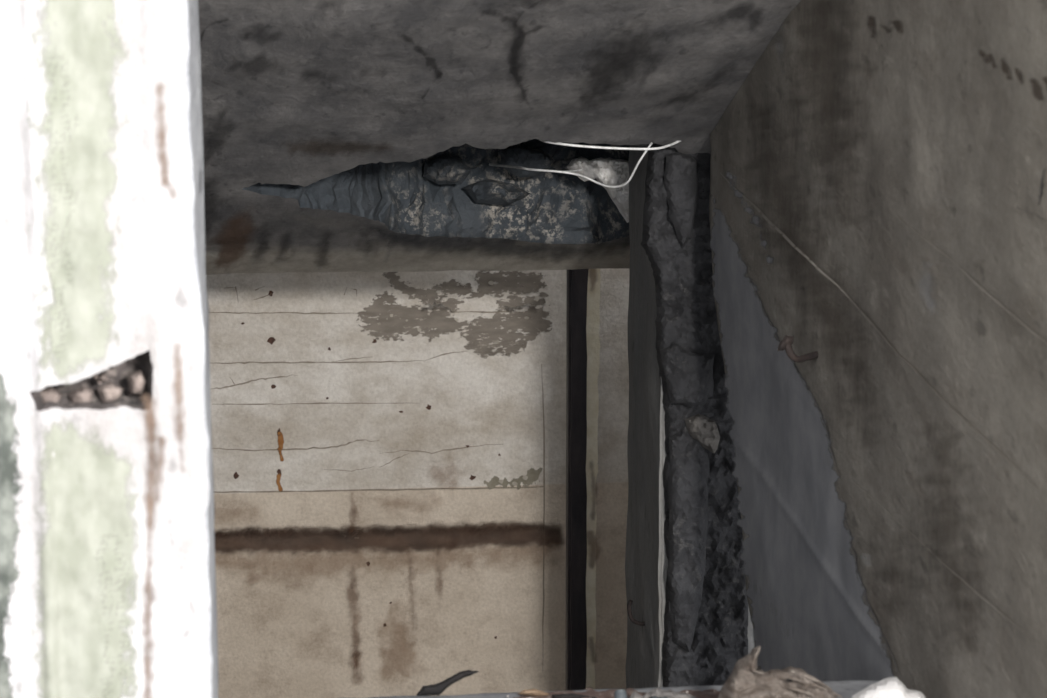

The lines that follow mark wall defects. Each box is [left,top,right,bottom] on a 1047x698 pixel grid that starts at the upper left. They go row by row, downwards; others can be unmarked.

spalling [242,139,630,244]
peeling [356,271,552,359]
flaking render [641,144,894,687]
peeling [484,467,542,490]
damp [214,523,562,552]